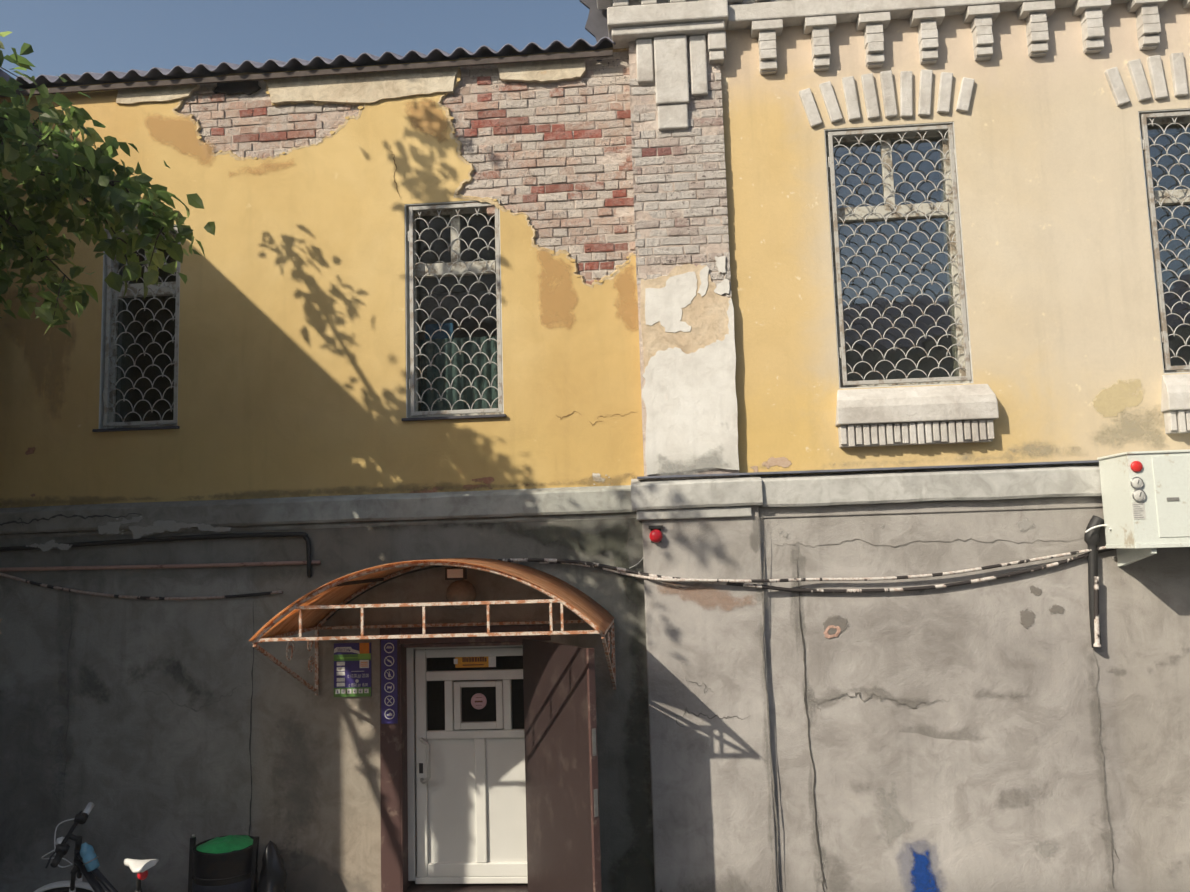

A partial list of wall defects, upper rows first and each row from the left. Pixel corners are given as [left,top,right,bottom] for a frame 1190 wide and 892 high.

peeling [172,72,365,160]
peeling [437,47,732,373]
leakage [540,251,577,327]
leakage [616,268,637,329]
crack [0,513,142,526]
peeling [98,516,231,539]
crack [674,520,1082,892]
crack [1093,650,1120,892]